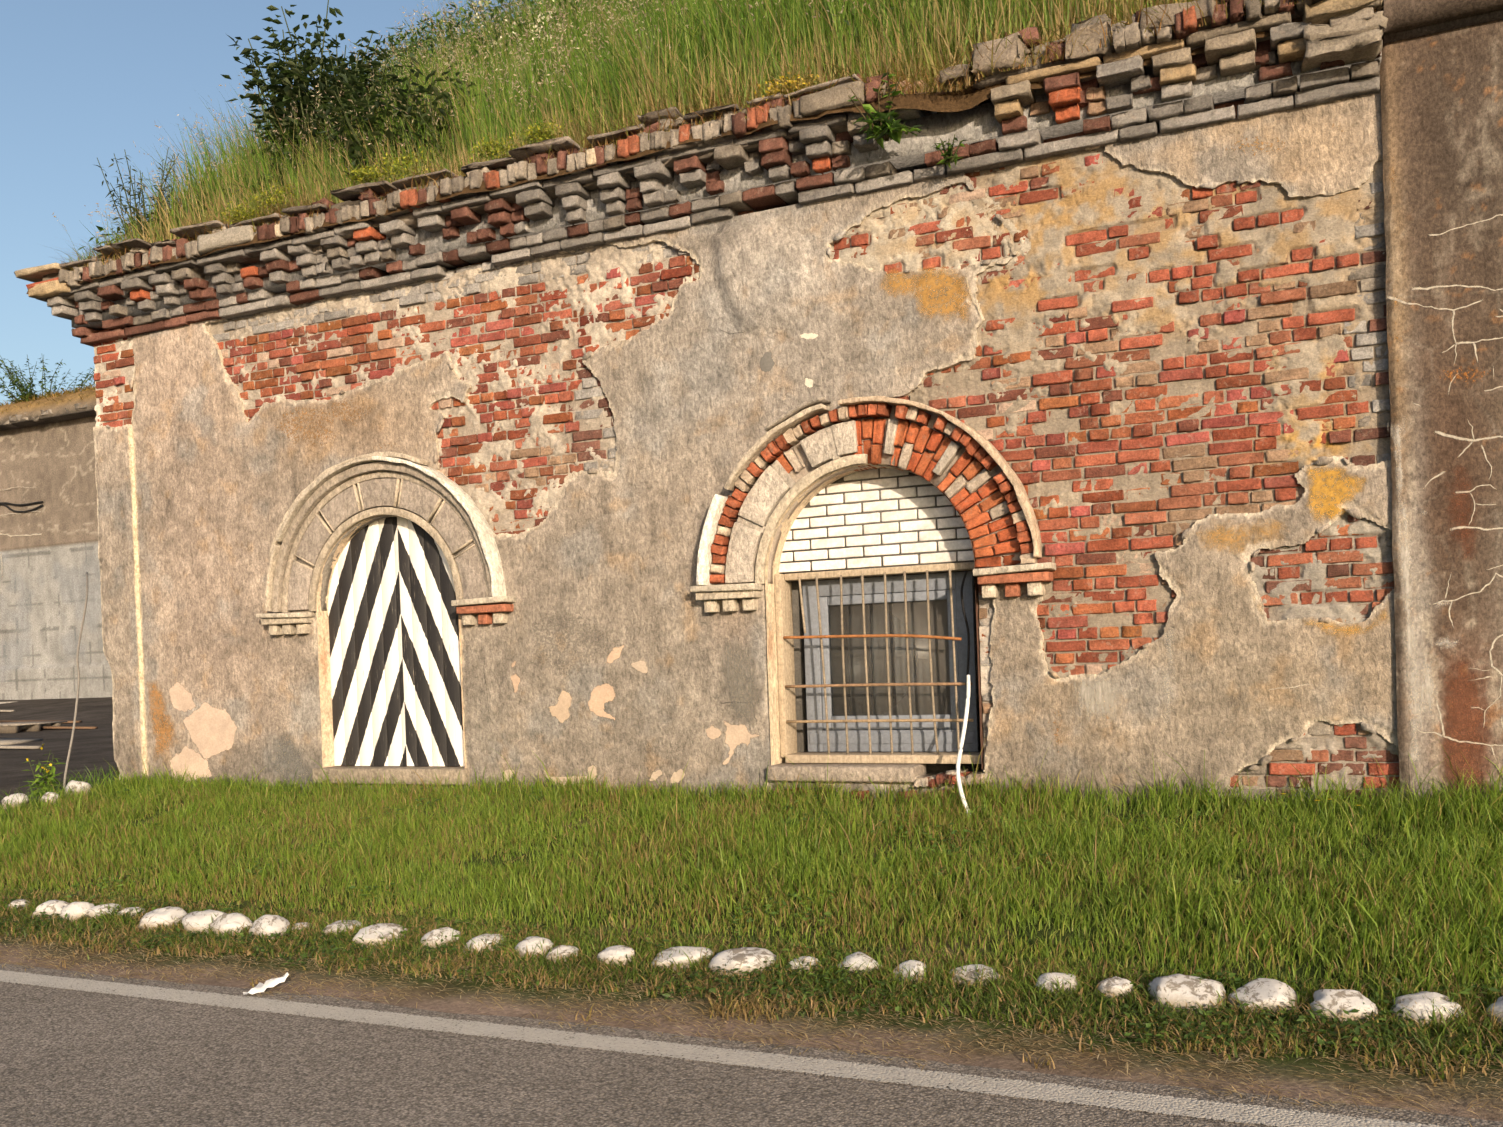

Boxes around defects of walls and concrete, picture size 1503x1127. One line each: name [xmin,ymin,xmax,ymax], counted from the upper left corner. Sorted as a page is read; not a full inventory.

crack [1429,214,1503,236]
spalling [93,329,135,428]
spalling [208,242,700,557]
spalling [826,147,1394,678]
crack [1388,285,1503,530]
crack [1434,565,1503,628]
spalling [1220,721,1400,806]
crack [1413,634,1503,756]
rust [1445,663,1485,787]